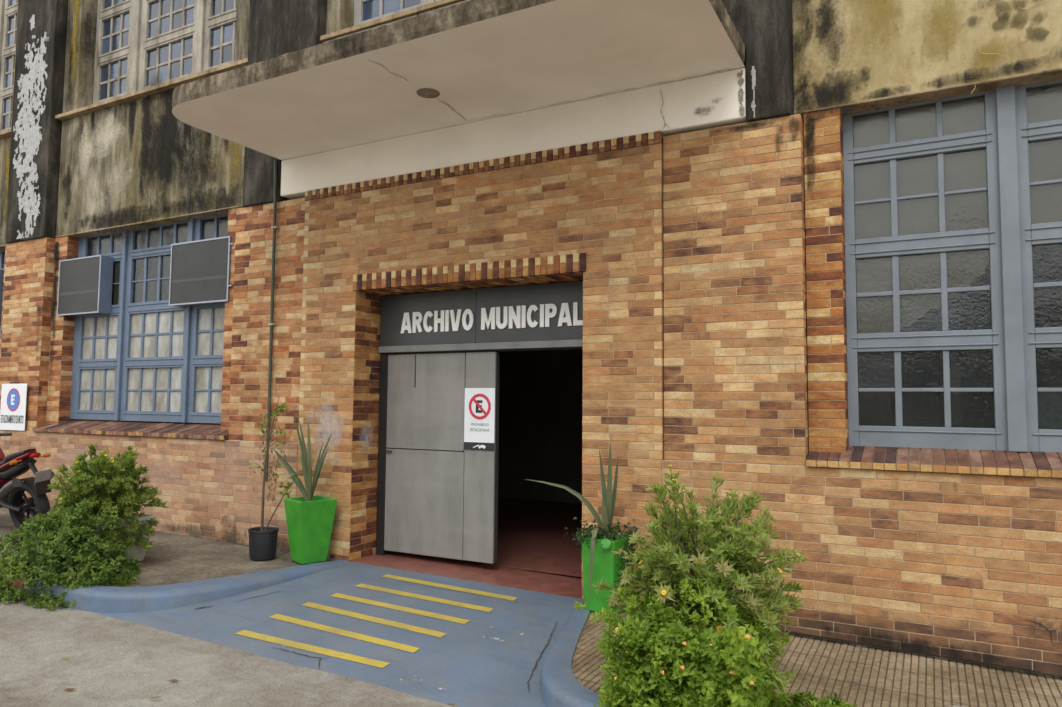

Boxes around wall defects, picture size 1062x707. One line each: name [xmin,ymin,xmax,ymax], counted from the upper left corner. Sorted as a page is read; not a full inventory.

water stain [793,0,843,68]
water stain [934,59,1035,87]
peeling [13,15,49,239]
water stain [62,167,71,219]
water stain [81,77,244,244]
water stain [791,69,868,188]
crack [527,621,558,692]